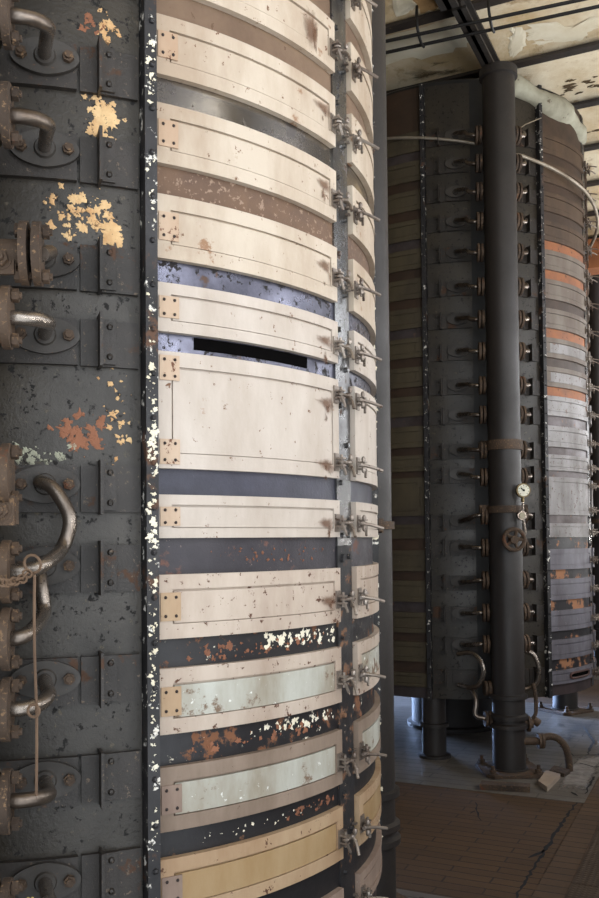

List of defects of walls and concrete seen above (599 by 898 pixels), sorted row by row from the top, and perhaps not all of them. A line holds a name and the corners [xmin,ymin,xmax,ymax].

peeling [78,8,121,45]
peeling [507,16,599,57]
peeling [81,94,127,140]
peeling [43,182,124,248]
corrosion [47,407,107,458]
peeling [187,626,335,661]
peeling [235,709,333,744]
crack [516,727,599,898]